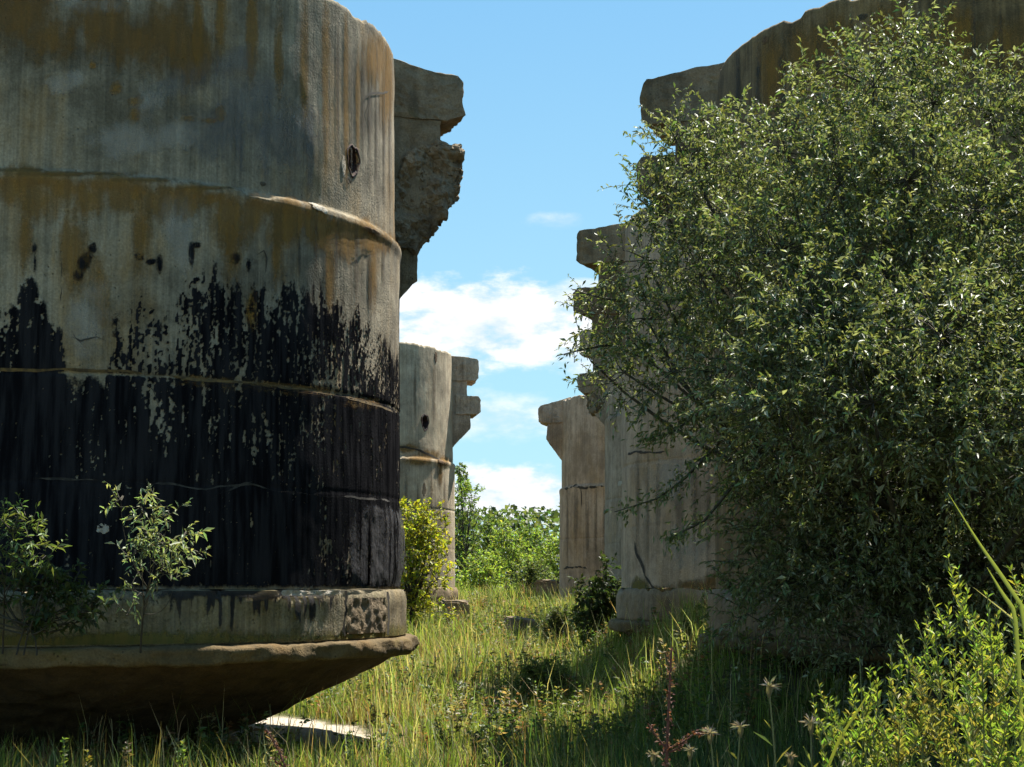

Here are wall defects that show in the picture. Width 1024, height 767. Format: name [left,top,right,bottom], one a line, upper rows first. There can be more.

rust [364,38,394,131]
rust [0,166,395,325]
spalling [278,590,387,634]